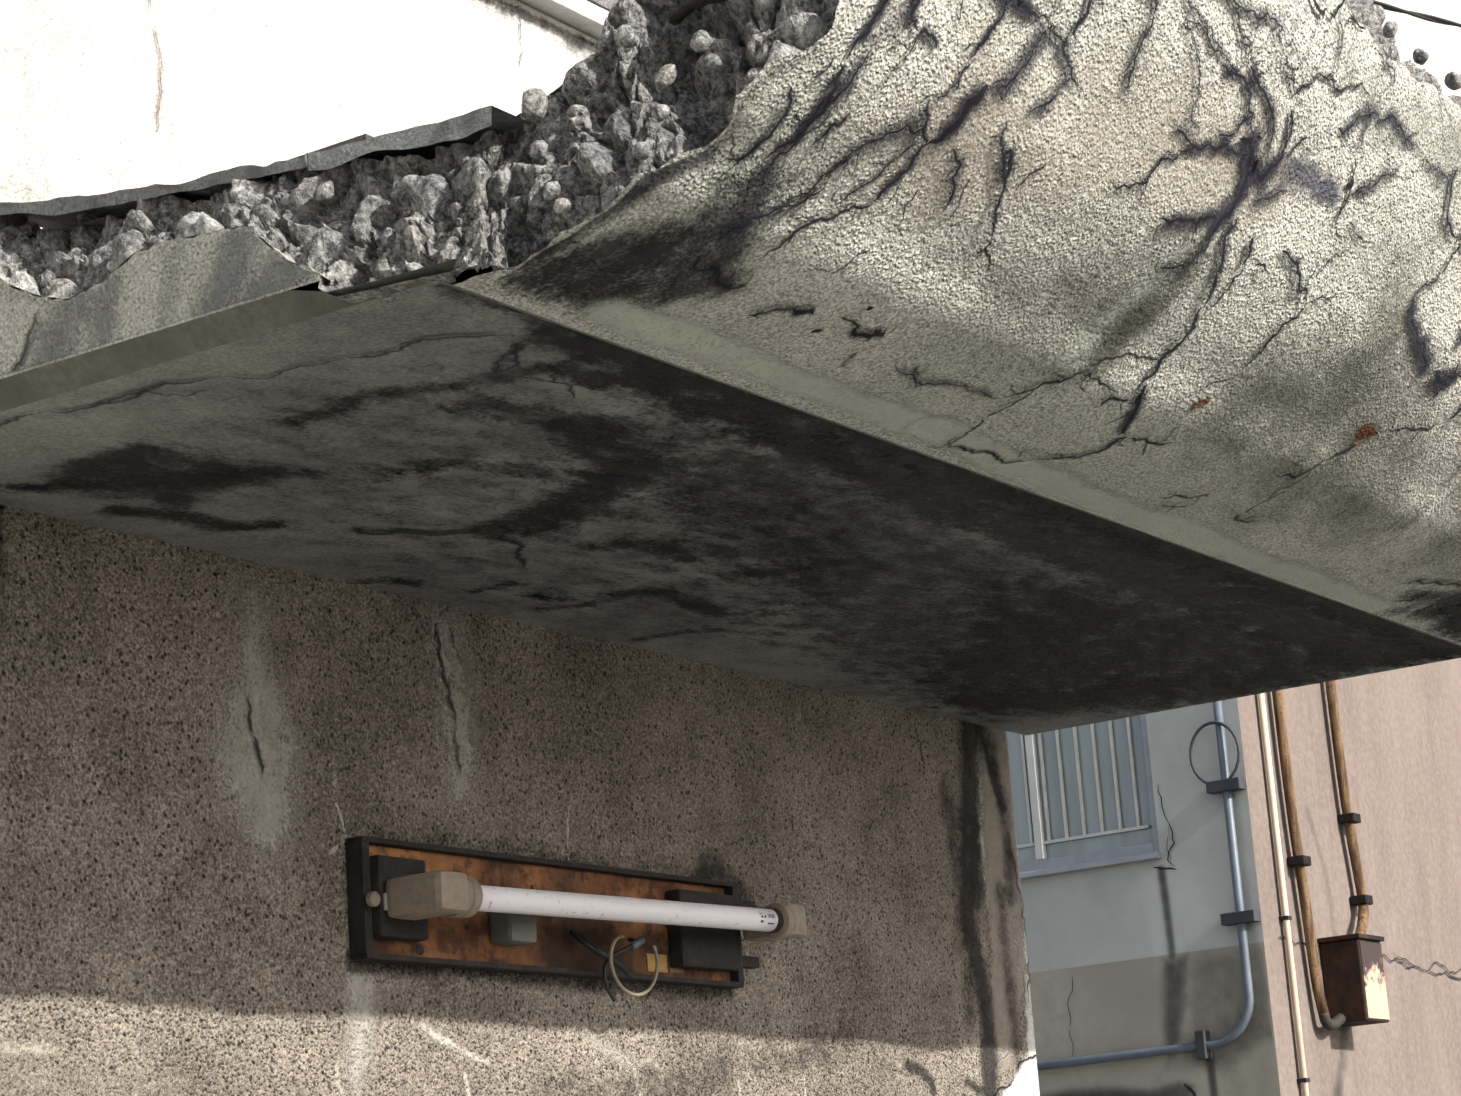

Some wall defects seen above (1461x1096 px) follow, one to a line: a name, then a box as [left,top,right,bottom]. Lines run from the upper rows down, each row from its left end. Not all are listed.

spalling [1341,0,1461,105]
spalling [0,0,839,308]
damp [201,228,310,314]
crack [661,0,1461,523]
crack [11,309,39,372]
crack [0,335,592,425]
damp [279,145,1461,722]
damp [1,443,356,532]
damp [0,504,1028,1096]
crack [1153,790,1177,870]
damp [1158,869,1181,1045]
crack [1382,953,1461,980]